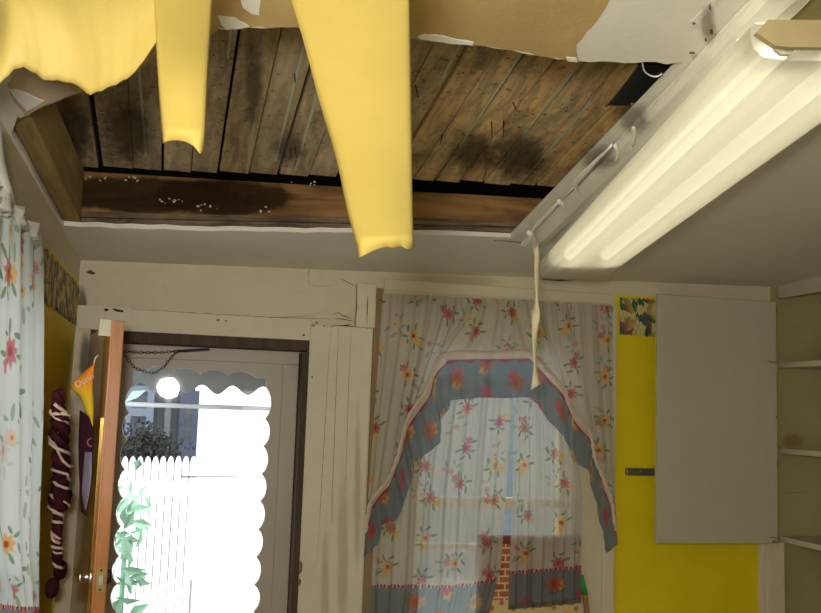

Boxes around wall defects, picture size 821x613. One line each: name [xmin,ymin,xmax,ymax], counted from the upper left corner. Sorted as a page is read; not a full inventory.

peeling [210,0,299,34]
peeling [410,0,610,60]
peeling [0,0,157,116]
water stain [246,61,260,107]
peeling [0,127,17,205]
water stain [454,136,541,177]
peeling [573,143,613,196]
water stain [82,177,292,215]
spalling [80,203,351,228]
spalling [413,225,516,233]